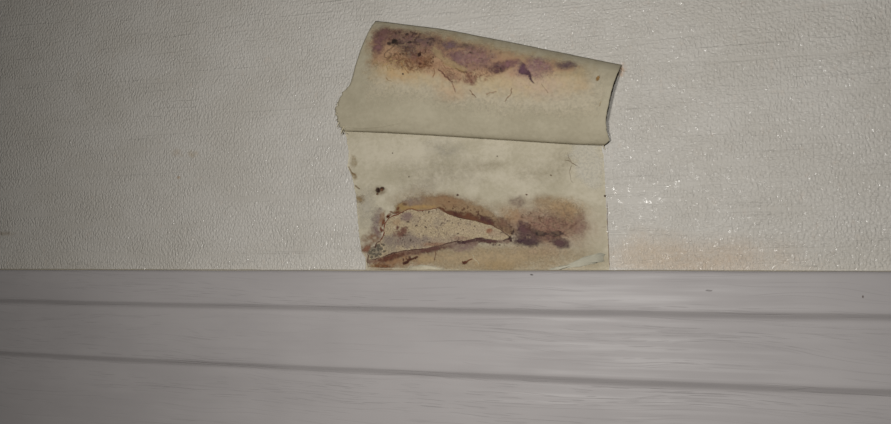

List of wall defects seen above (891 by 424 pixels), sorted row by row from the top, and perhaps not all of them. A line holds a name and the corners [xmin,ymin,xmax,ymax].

damp [369,29,602,113]
damp [362,194,587,270]
peeling [345,131,610,275]